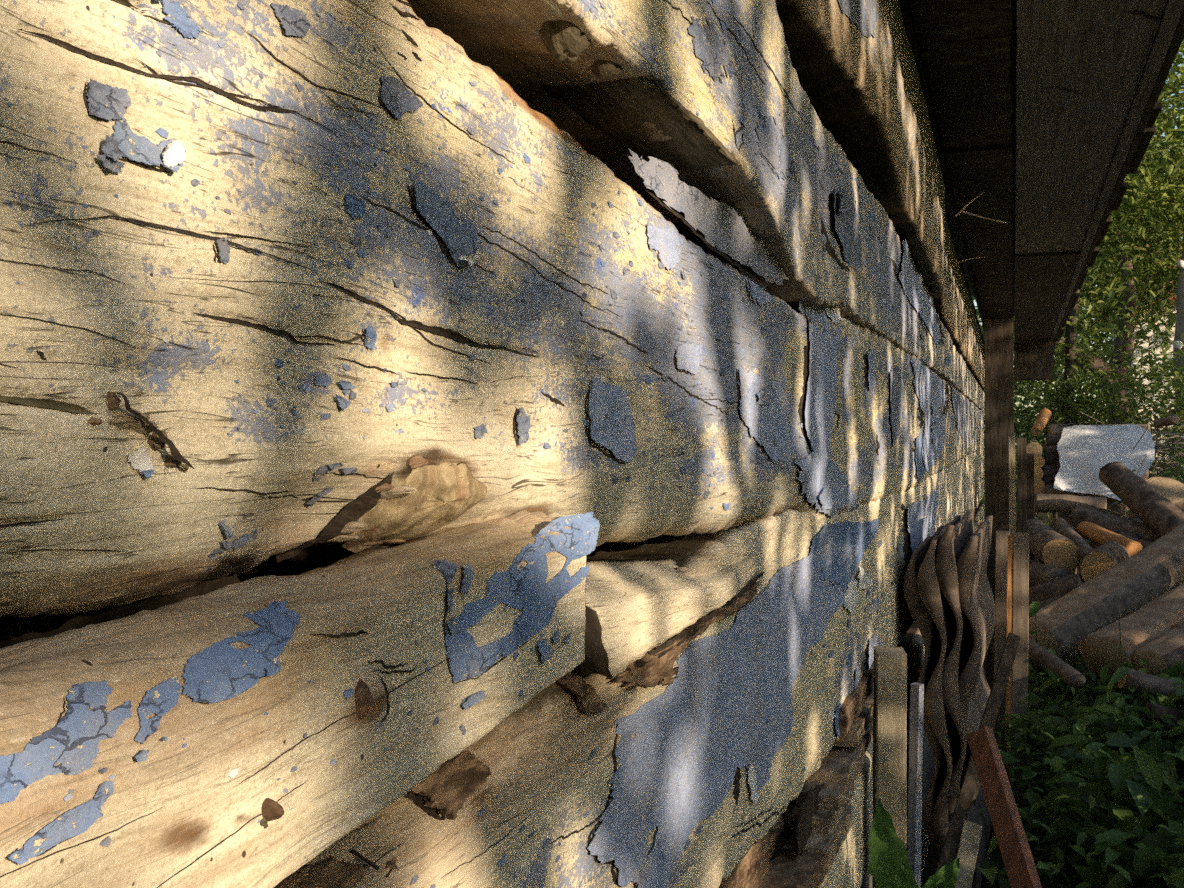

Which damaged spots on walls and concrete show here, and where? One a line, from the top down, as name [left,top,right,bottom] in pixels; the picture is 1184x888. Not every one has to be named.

crack [116,0,173,25]
peeling [838,0,879,38]
peeling [83,78,186,173]
peeling [402,164,486,283]
peeling [584,232,620,267]
peeling [628,148,790,306]
peeling [740,92,971,481]
peeling [248,359,303,422]
peeling [433,504,600,709]
peeling [578,300,939,888]
peeling [0,601,301,865]
peeling [518,825,561,862]